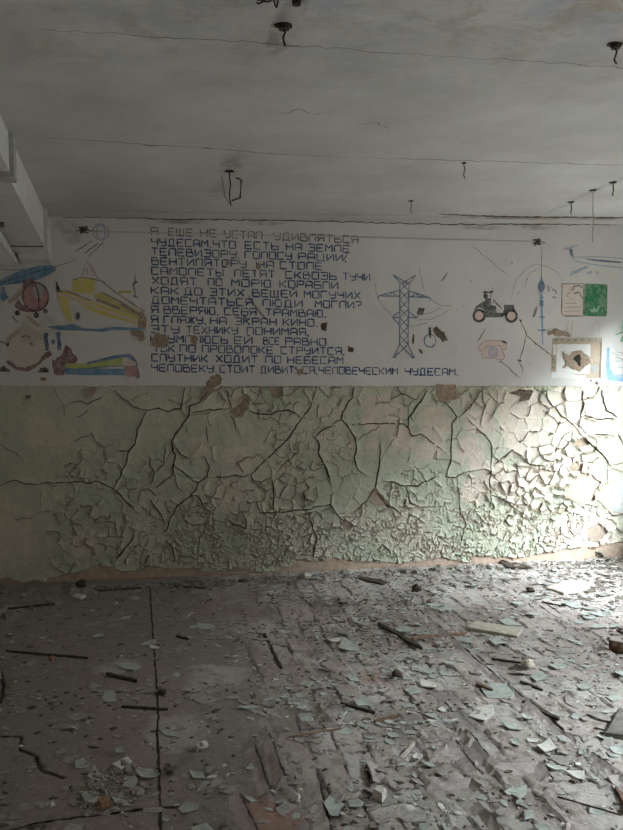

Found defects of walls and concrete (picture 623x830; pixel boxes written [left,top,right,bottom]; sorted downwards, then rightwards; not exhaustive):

flaking render [431,326,448,344]
flaking render [552,350,591,376]
crack [1,386,345,560]
crack [314,388,623,544]
crack [263,633,282,668]
crack [394,591,537,706]
crack [2,588,179,830]
peeling [383,589,623,793]
crack [551,720,619,772]
peeling [366,762,384,784]
peeling [468,802,504,830]
peeling [533,792,623,830]